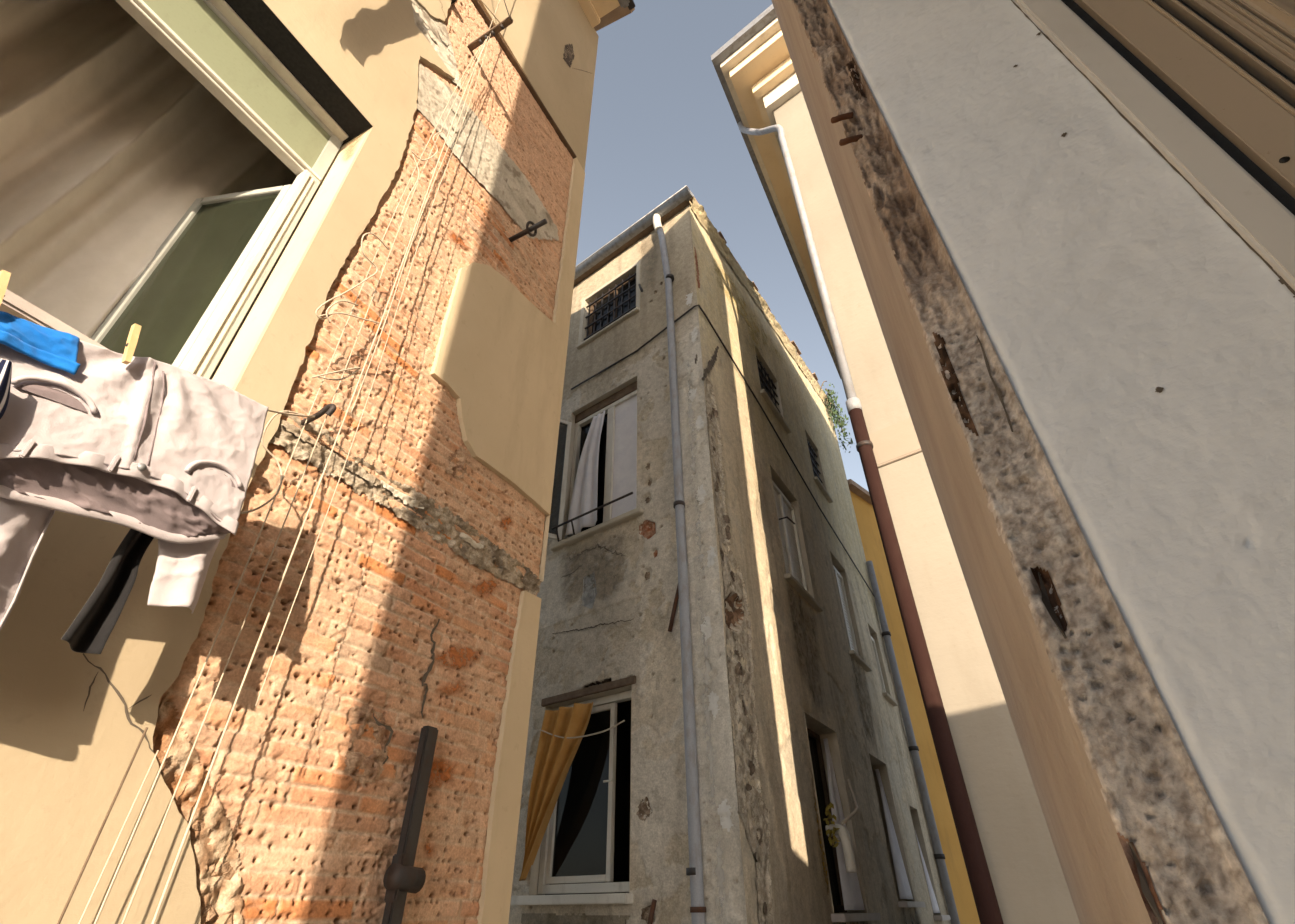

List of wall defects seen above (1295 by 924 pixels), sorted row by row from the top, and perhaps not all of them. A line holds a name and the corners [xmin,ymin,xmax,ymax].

peeling [563,44,590,73]
crack [83,653,153,752]
flaking render [153,0,573,924]
spalling [688,377,773,924]
spalling [792,0,1269,924]